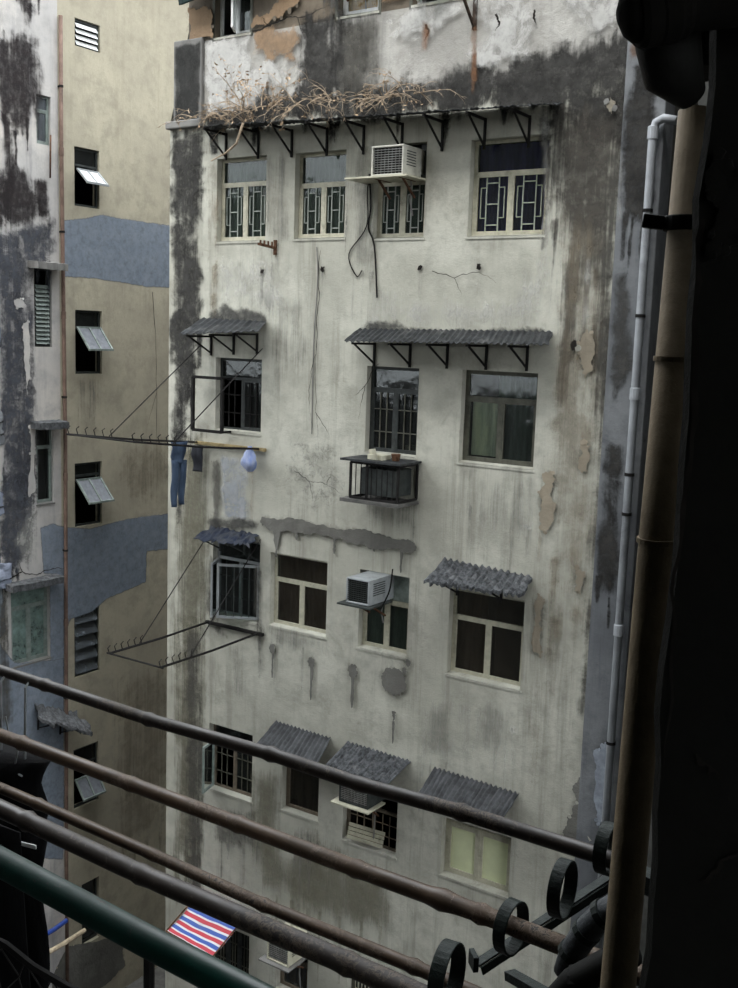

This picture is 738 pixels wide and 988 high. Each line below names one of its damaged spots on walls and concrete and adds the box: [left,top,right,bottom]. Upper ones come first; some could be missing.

water stain [16,0,40,21]
peeling [395,4,462,37]
peeling [567,0,618,30]
peeling [188,0,300,112]
water stain [0,33,55,580]
water stain [169,0,655,727]
peeling [537,471,556,535]
water stain [176,734,202,801]
water stain [179,811,202,867]